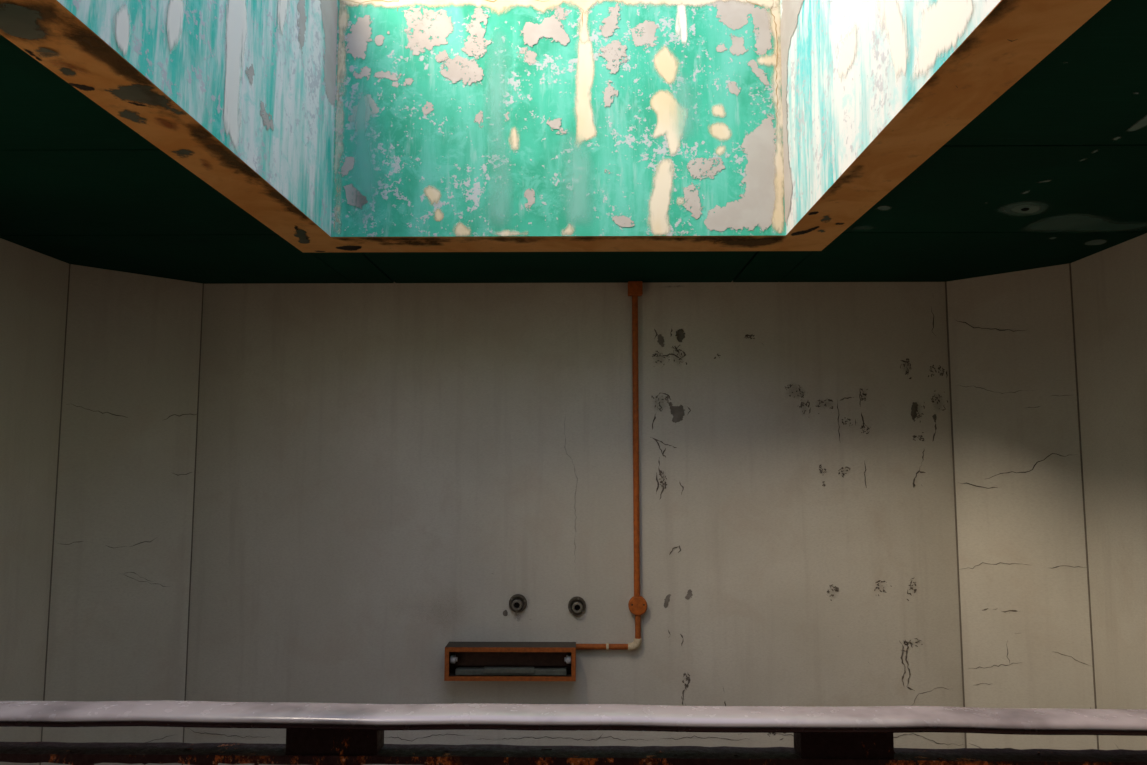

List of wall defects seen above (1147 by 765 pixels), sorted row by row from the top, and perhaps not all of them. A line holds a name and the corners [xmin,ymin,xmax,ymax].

peeling [0,2,184,129]
peeling [297,0,307,54]
peeling [320,0,414,132]
peeling [402,6,492,86]
peeling [517,6,570,65]
peeling [598,3,659,107]
peeling [546,118,567,135]
peeling [682,0,845,236]
peeling [172,127,362,252]
peeling [524,188,535,208]
peeling [612,215,635,227]
crack [958,453,1068,489]